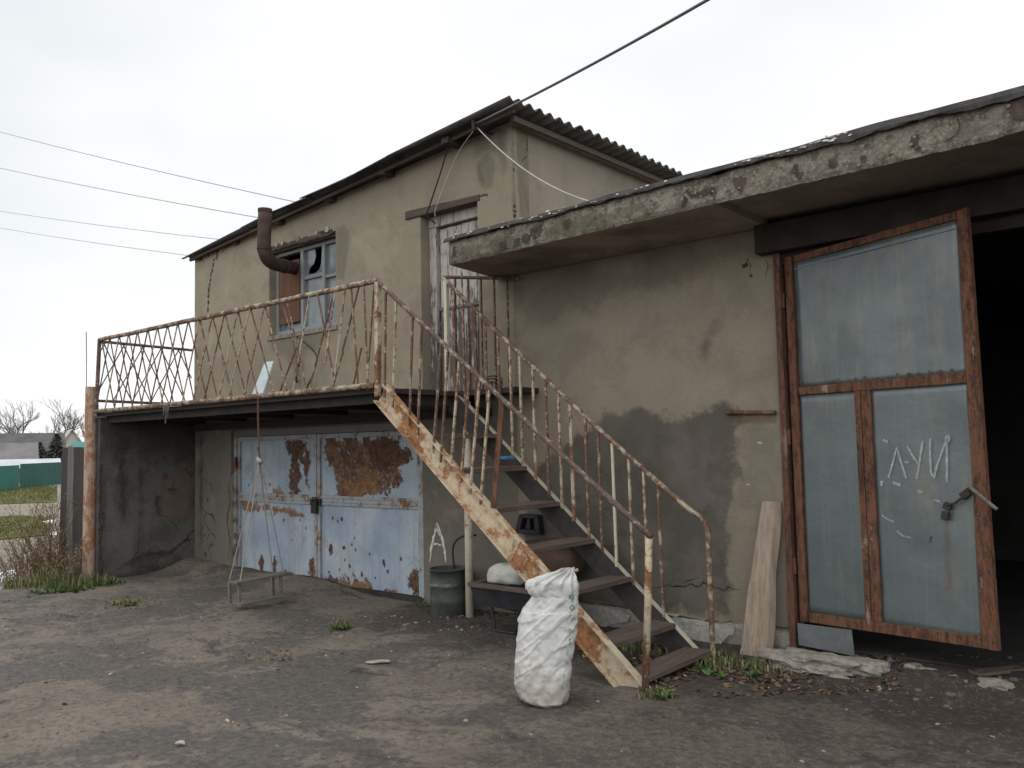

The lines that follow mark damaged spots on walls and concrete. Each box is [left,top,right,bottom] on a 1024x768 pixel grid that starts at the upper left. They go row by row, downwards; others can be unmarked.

peeling [786,132,852,152]
spalling [908,134,924,152]
spalling [681,186,714,208]
crack [118,478,216,569]
rust [241,434,311,530]
rust [323,430,413,497]
leakage [537,403,742,614]
rust [308,537,419,596]
crack [641,578,740,591]